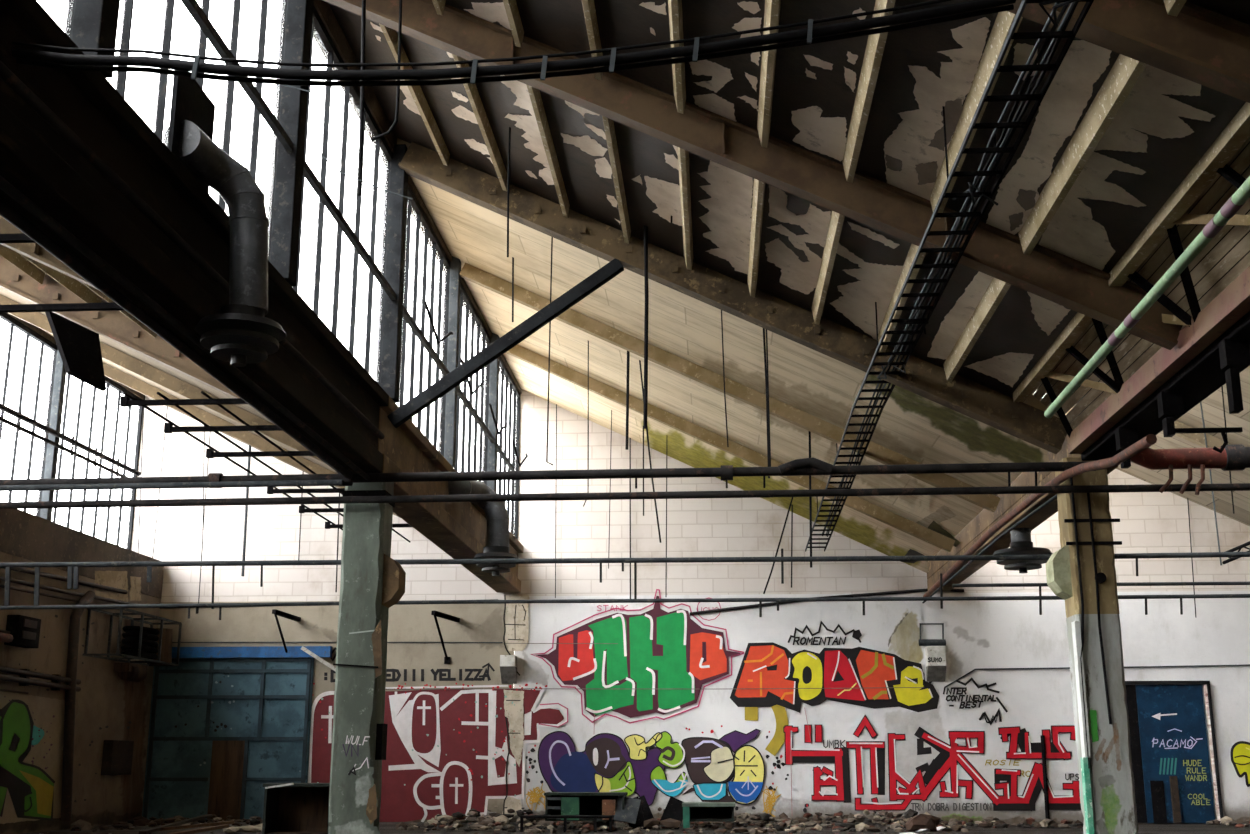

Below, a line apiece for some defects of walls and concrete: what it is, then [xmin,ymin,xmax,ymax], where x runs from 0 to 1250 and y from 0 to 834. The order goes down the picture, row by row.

peeling [500,75,554,185]
peeling [561,101,612,179]
peeling [632,145,682,226]
peeling [689,52,761,122]
peeling [698,160,753,275]
peeling [791,106,847,161]
peeling [765,185,903,340]
peeling [883,17,991,200]
peeling [986,40,1112,235]
peeling [1039,64,1215,270]
leakage [692,345,932,464]
leakage [691,379,937,522]